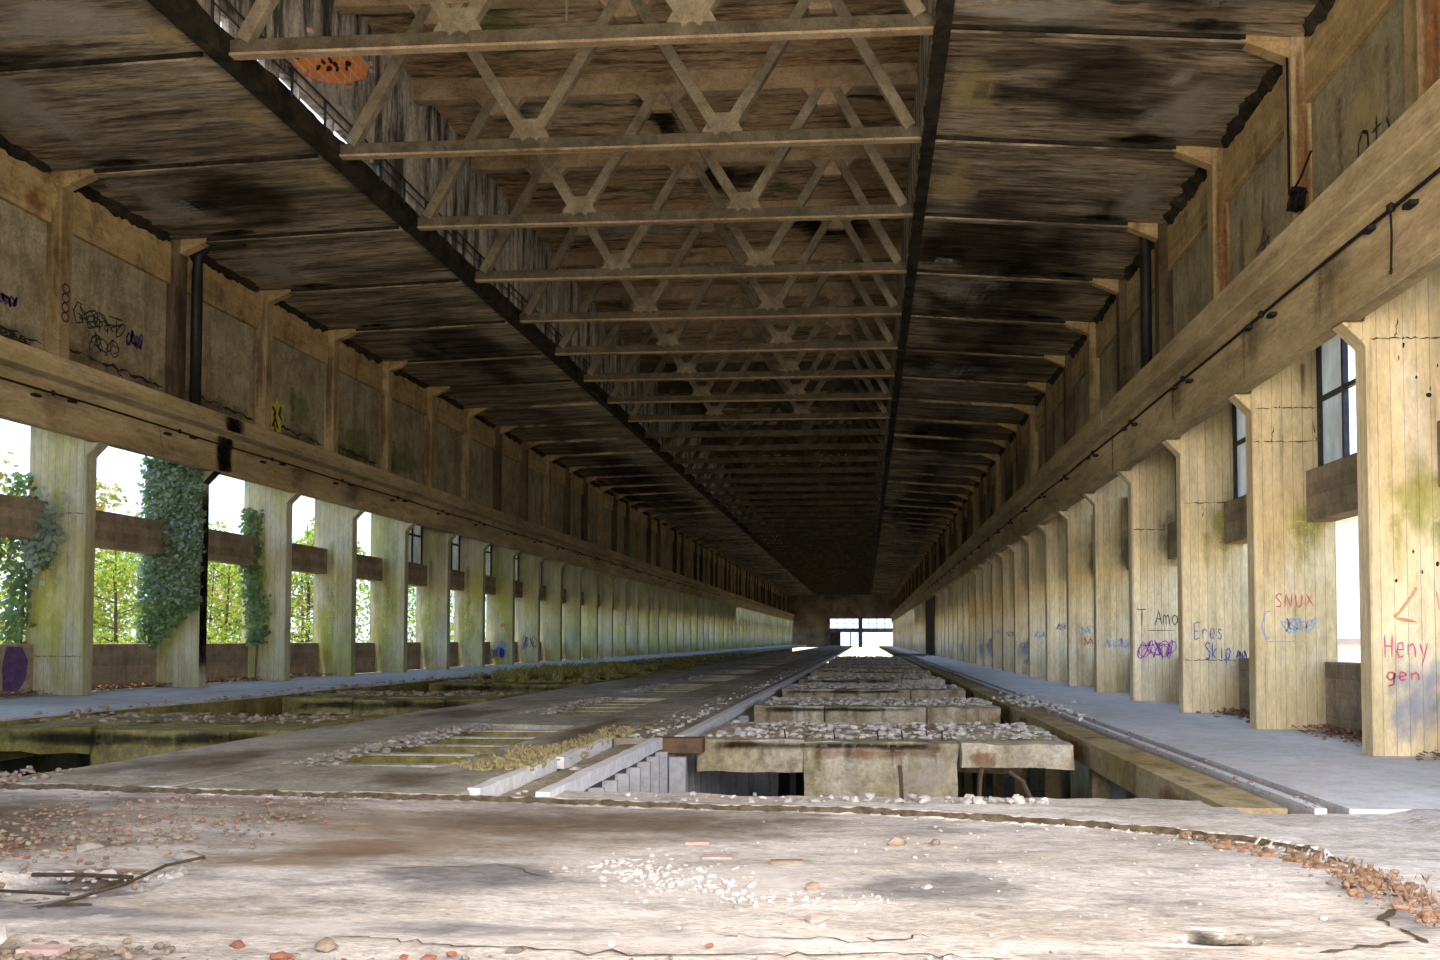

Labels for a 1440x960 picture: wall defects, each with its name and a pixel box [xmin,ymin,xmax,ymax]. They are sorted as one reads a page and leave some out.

water stain [1177,19,1240,31]
water stain [1114,135,1165,143]